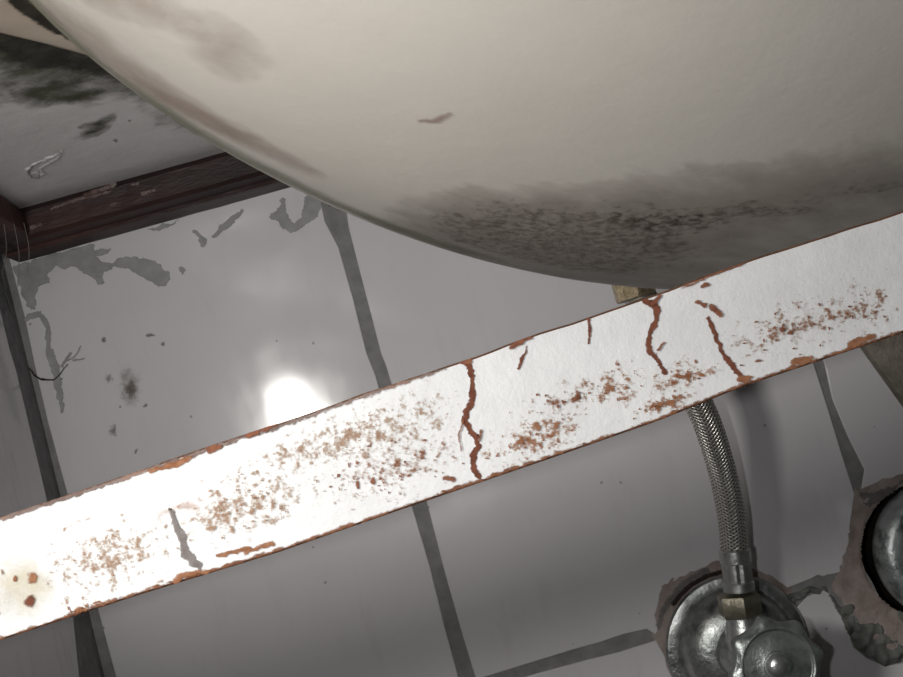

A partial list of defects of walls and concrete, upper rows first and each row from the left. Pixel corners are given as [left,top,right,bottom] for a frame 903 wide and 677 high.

leakage [0,33,134,105]
leakage [84,118,111,135]
corrosion [682,263,744,288]
crack [642,294,668,375]
crack [695,300,743,376]
corrosion [630,286,900,429]
crack [458,358,482,479]
corrosion [0,361,642,633]
spalling [651,560,722,676]
spalling [752,474,903,667]